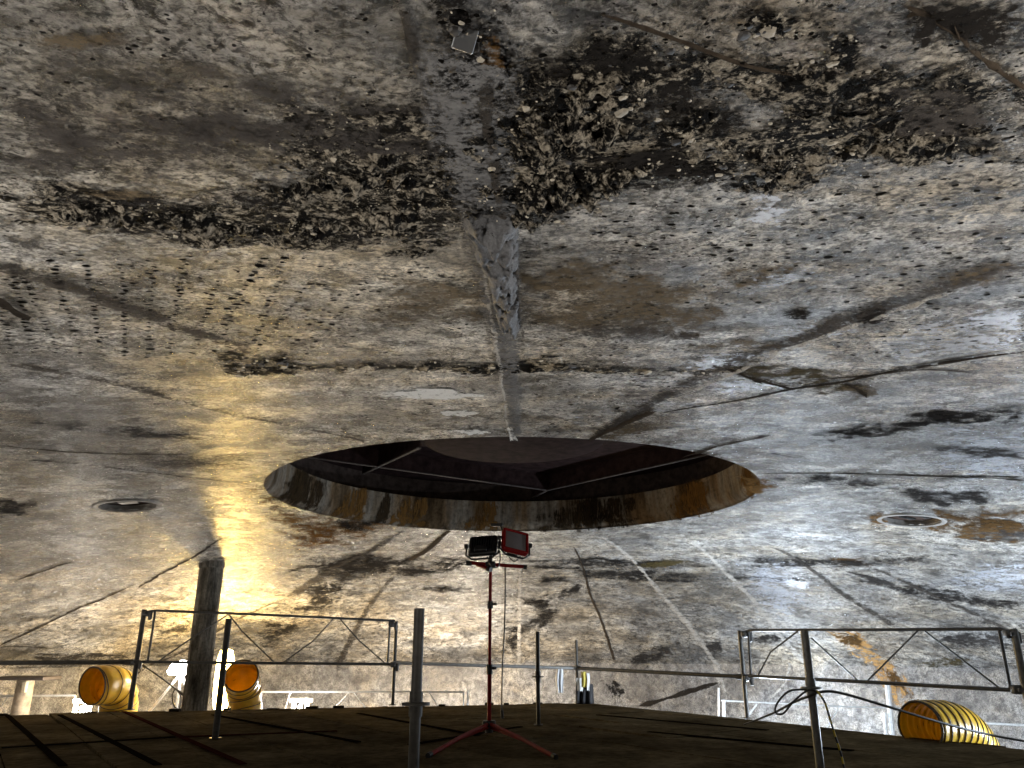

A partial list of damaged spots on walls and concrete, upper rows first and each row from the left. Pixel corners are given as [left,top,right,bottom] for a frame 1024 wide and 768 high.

spalling [0,0,1024,259]
crack [660,351,1024,414]
water stain [770,405,1024,508]
corrosion [928,506,1024,543]
crack [0,537,223,648]
corrosion [825,631,919,705]